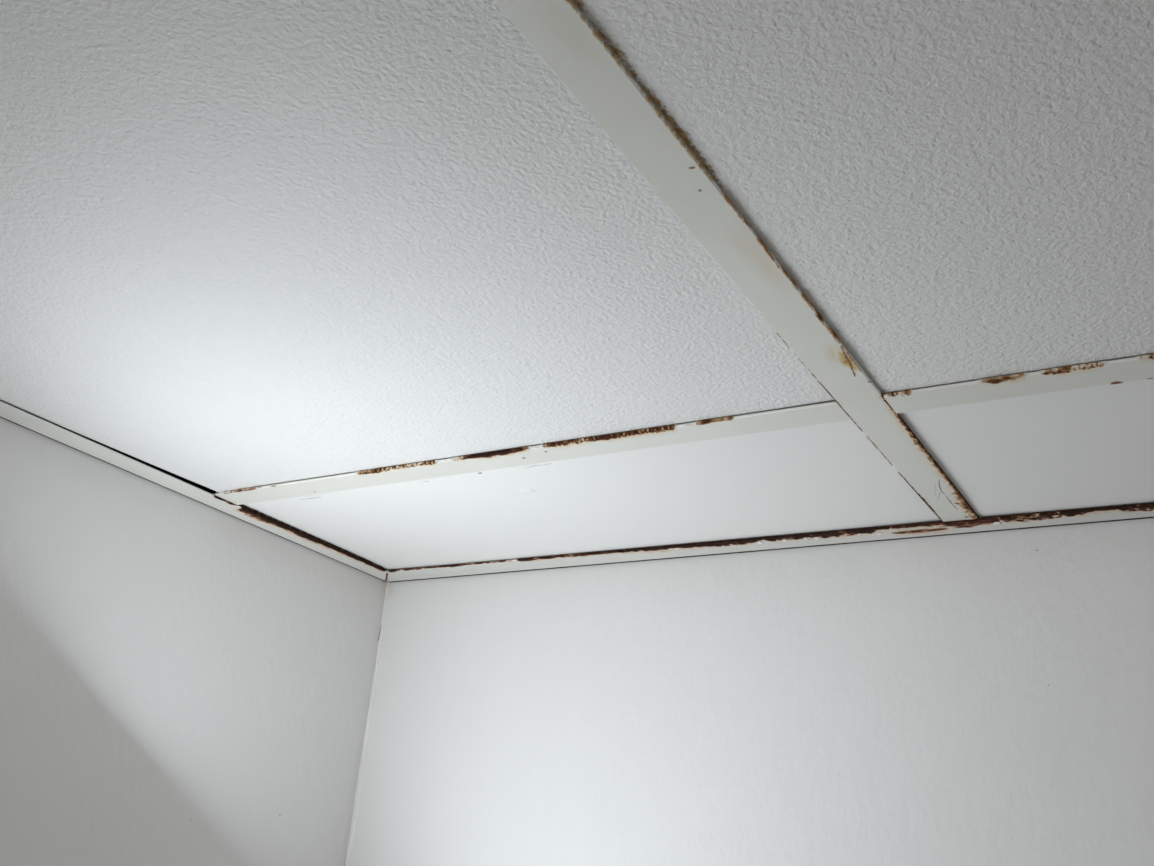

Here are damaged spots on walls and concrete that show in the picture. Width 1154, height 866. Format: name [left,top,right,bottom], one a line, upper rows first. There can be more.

corrosion [213,0,1154,581]